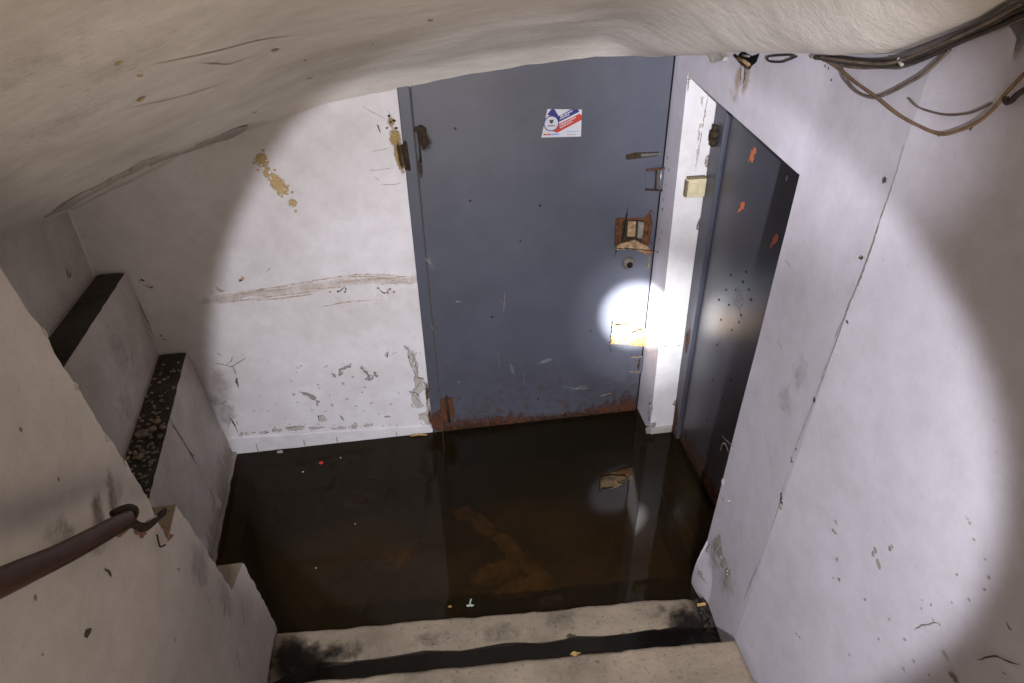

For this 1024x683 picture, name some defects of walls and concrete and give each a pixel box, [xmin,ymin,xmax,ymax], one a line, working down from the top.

corrosion [386,115,405,173]
crack [215,352,245,432]
spalling [238,345,432,437]
corrosion [426,384,637,431]
peeling [706,534,731,589]